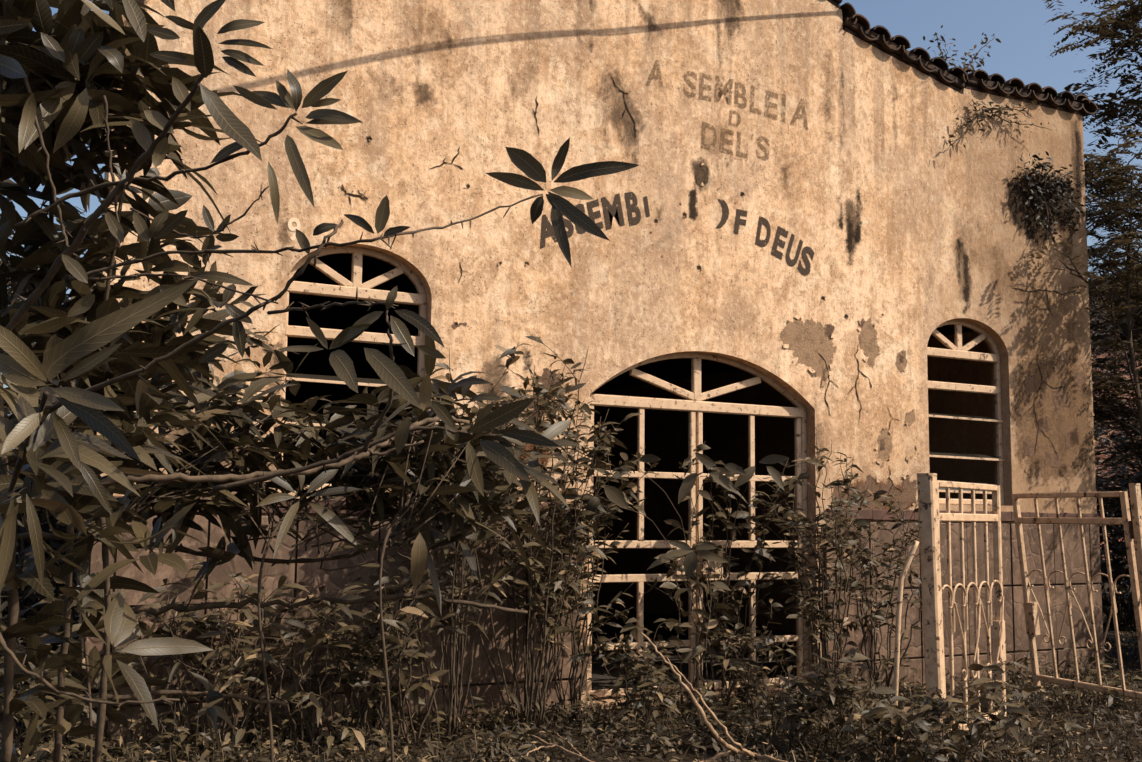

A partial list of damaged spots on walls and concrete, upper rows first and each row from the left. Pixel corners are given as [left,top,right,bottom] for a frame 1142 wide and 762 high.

leakage [720,0,742,35]
leakage [605,77,643,163]
crack [430,146,463,169]
leakage [1006,121,1085,255]
leakage [839,190,862,265]
leakage [957,239,971,312]
peeling [780,313,885,387]
peeling [895,349,907,373]
spalling [1011,352,1096,485]